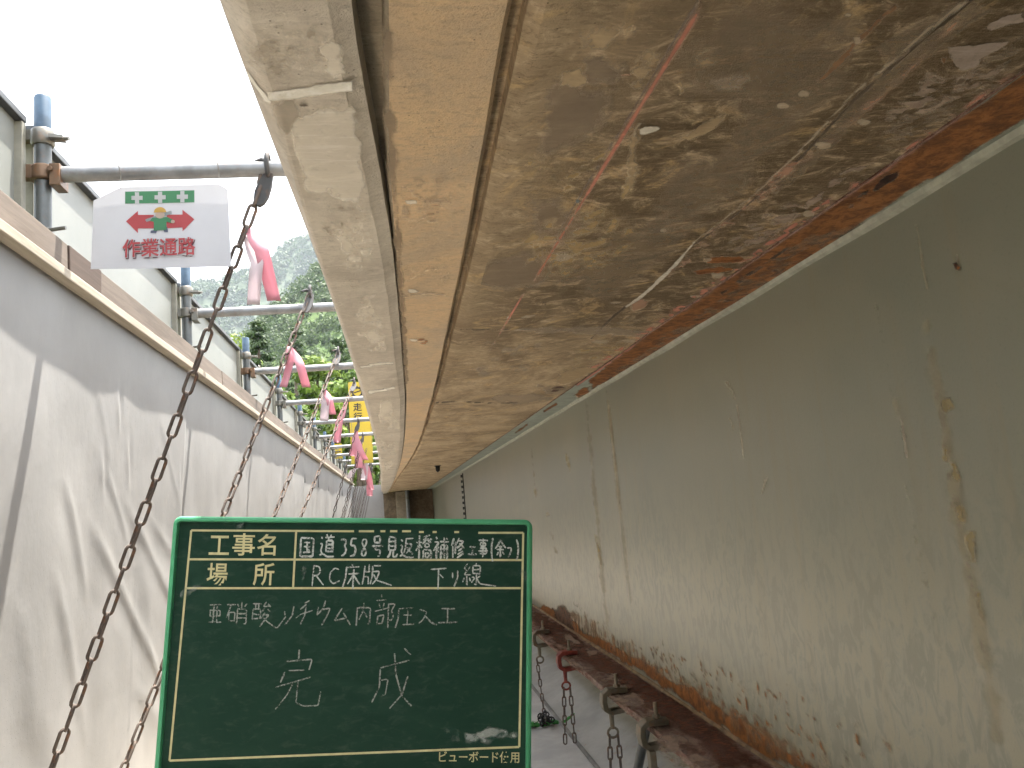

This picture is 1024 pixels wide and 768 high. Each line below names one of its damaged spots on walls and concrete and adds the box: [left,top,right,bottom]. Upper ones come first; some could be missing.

crack [461,1,986,339]
corrosion [427,69,1024,489]
corrosion [533,605,826,768]